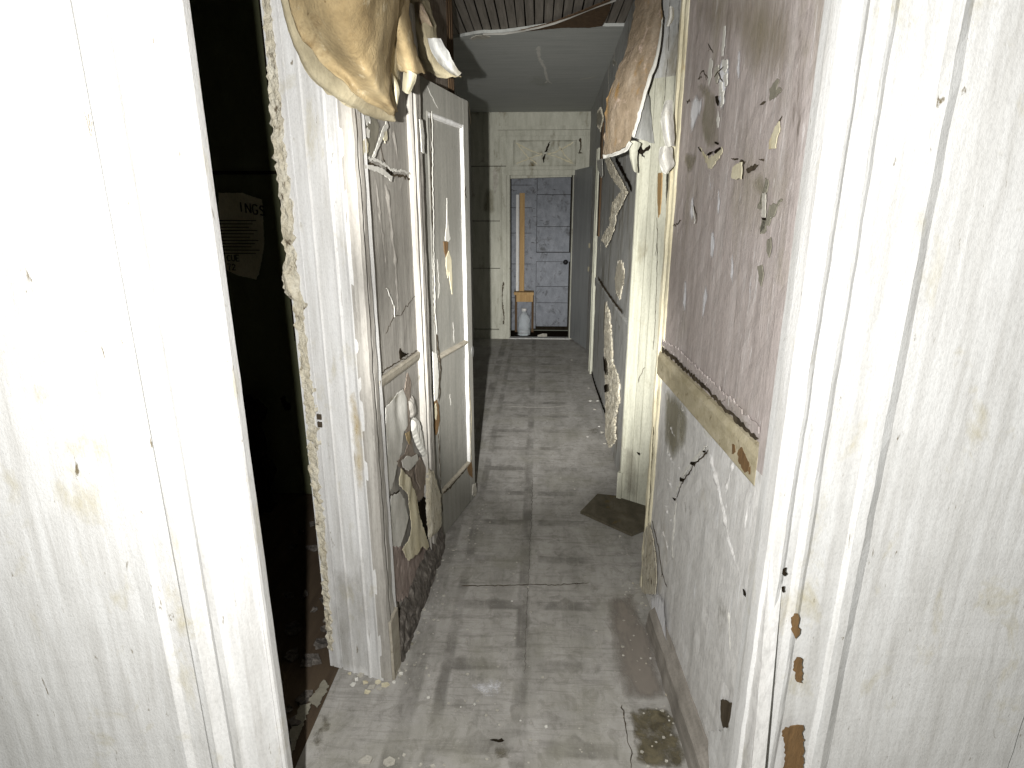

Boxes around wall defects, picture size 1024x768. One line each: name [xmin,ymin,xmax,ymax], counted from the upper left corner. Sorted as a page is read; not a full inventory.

peeling [597,0,691,248]
peeling [698,26,764,180]
peeling [760,79,782,105]
spalling [262,0,334,651]
crack [367,111,454,401]
peeling [757,178,783,287]
flaking render [392,373,428,602]
crack [648,439,708,586]
water stain [632,709,685,766]
peeling [782,724,804,768]
peeling [791,613,801,639]
peeling [793,657,803,683]